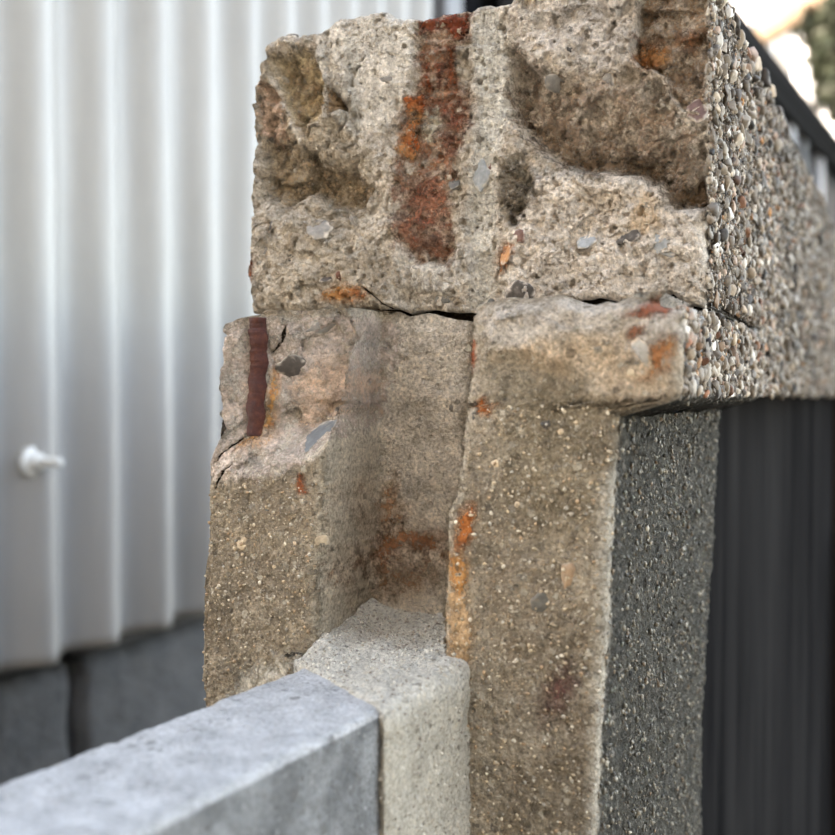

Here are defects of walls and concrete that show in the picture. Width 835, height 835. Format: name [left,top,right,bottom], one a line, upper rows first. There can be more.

spalling [258,81,292,157]
spalling [285,68,348,129]
rust [392,13,472,268]
spalling [507,0,710,209]
spalling [497,160,536,218]
crack [273,325,286,352]
crack [361,286,476,322]
crack [582,297,617,305]
rust [626,296,672,339]
rust [638,334,677,380]
crack [671,294,753,329]
rust [357,485,474,662]